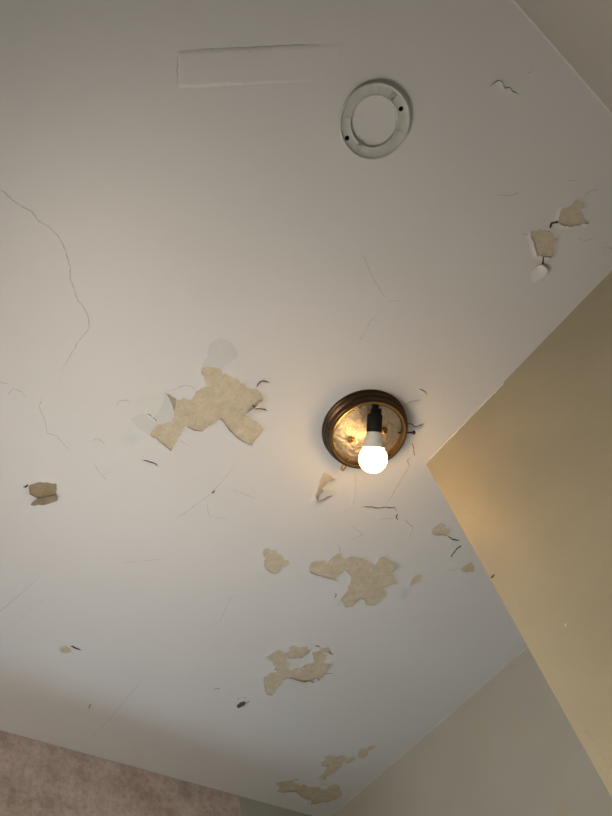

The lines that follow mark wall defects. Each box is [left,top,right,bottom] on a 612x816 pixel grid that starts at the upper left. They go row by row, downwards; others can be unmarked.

peeling [526,195,593,283]
peeling [130,338,273,454]
flaking render [17,471,67,509]
peeling [302,469,341,513]
crack [360,506,413,538]
peeling [259,545,293,576]
peeling [305,549,425,609]
peeling [260,643,335,697]
peeling [273,743,378,805]